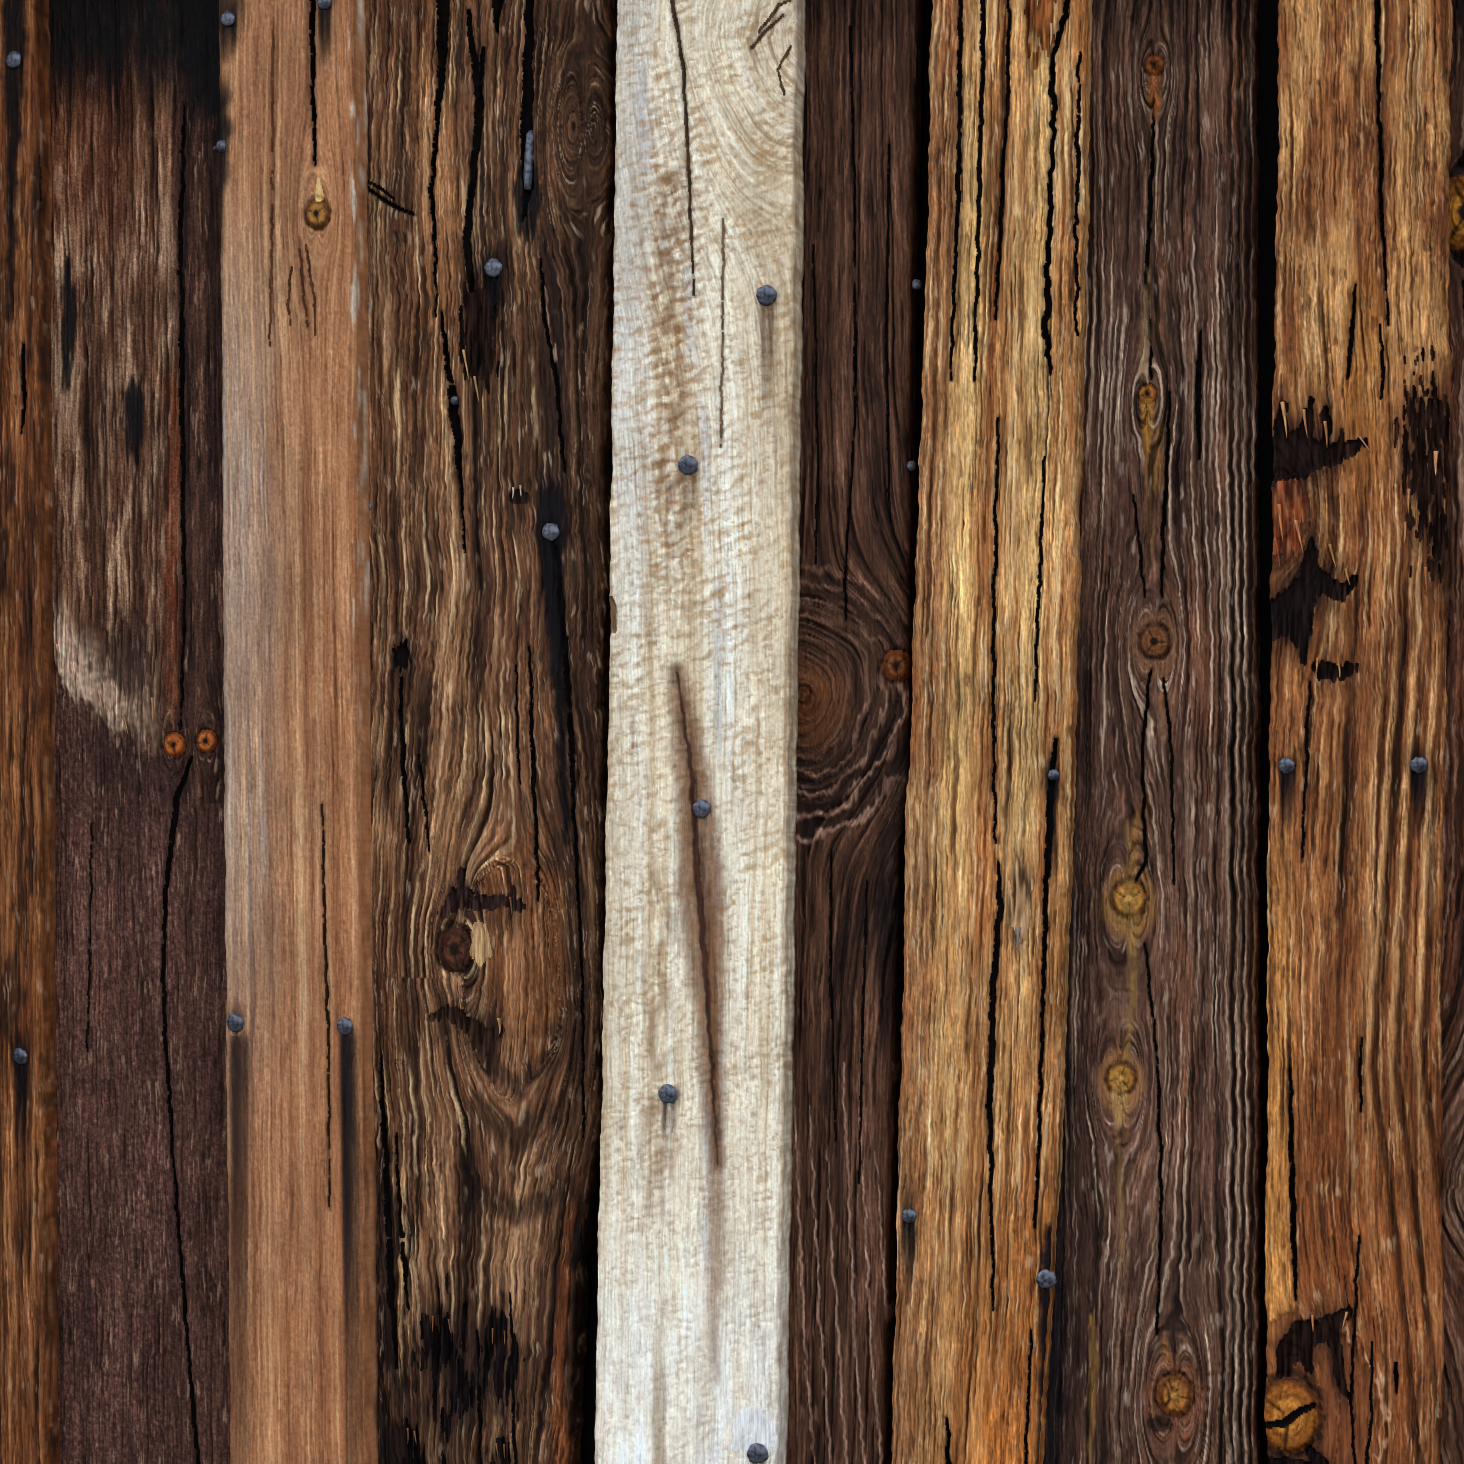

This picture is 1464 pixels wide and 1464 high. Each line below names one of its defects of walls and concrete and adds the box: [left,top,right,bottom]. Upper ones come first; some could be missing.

crack [367,0,535,553]
crack [539,258,567,473]
crack [670,0,725,448]
crack [949,0,1011,382]
crack [1041,0,1082,376]
crack [1034,456,1046,702]
crack [160,105,201,1464]
crack [985,417,1004,1311]
crack [1032,738,1058,1229]
crack [944,1418,952,1464]
crack [1024,1330,1033,1464]